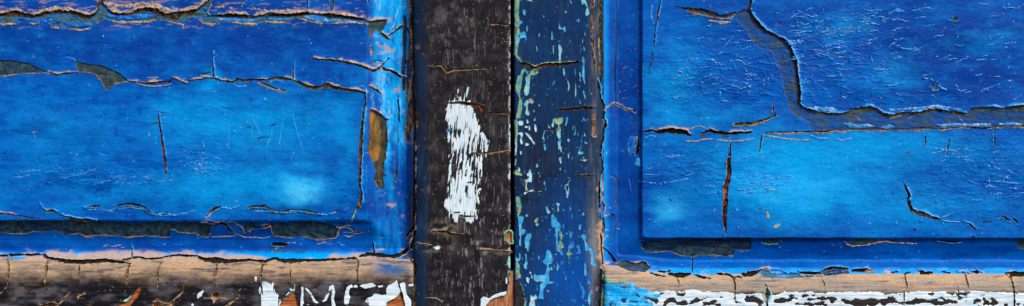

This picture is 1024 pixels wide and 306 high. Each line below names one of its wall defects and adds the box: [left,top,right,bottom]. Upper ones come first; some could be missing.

peeling [0,218,368,254]
peeling [0,0,421,195]
crack [0,51,513,306]
crack [491,0,1024,306]
peeling [507,0,1024,306]